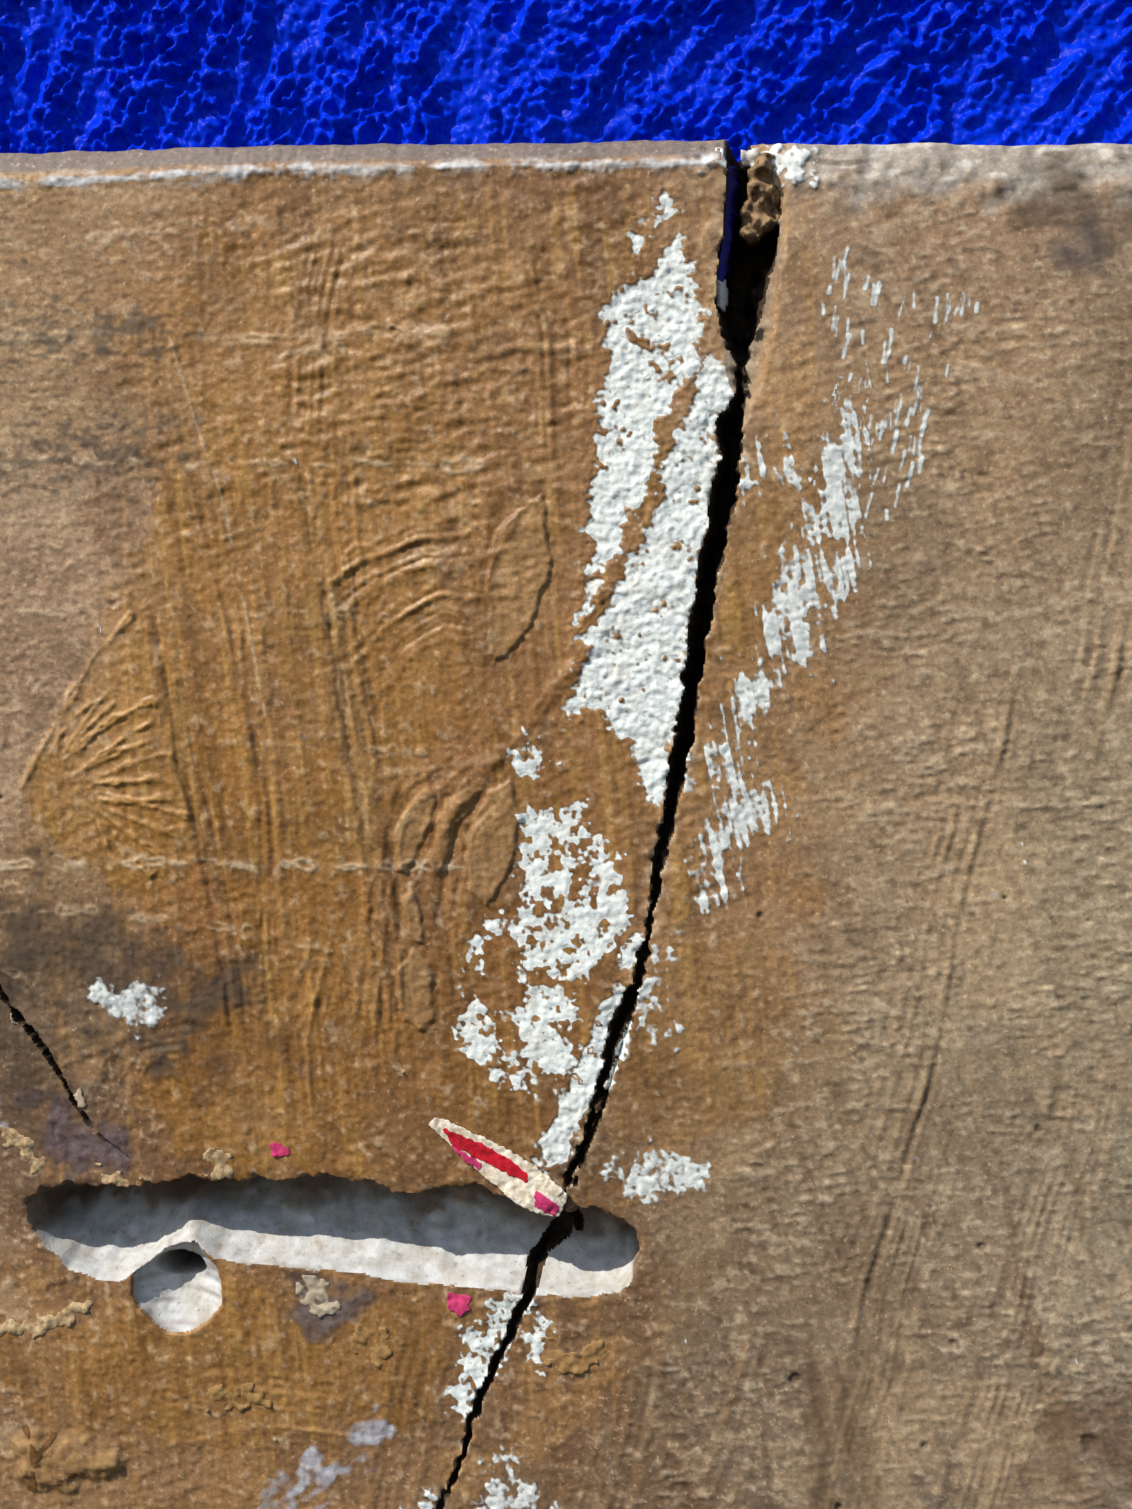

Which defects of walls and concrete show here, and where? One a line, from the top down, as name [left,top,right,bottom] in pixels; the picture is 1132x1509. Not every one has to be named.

peeling [626,191,683,254]
peeling [561,233,930,914]
peeling [507,727,561,780]
crack [436,140,782,1509]
peeling [451,798,684,1175]
crack [0,984,104,1139]
spalling [93,1161,142,1187]
spalling [203,1148,234,1181]
spalling [296,1275,341,1318]
peeling [443,1292,605,1422]
peeling [399,1490,438,1509]
peeling [474,1446,559,1509]